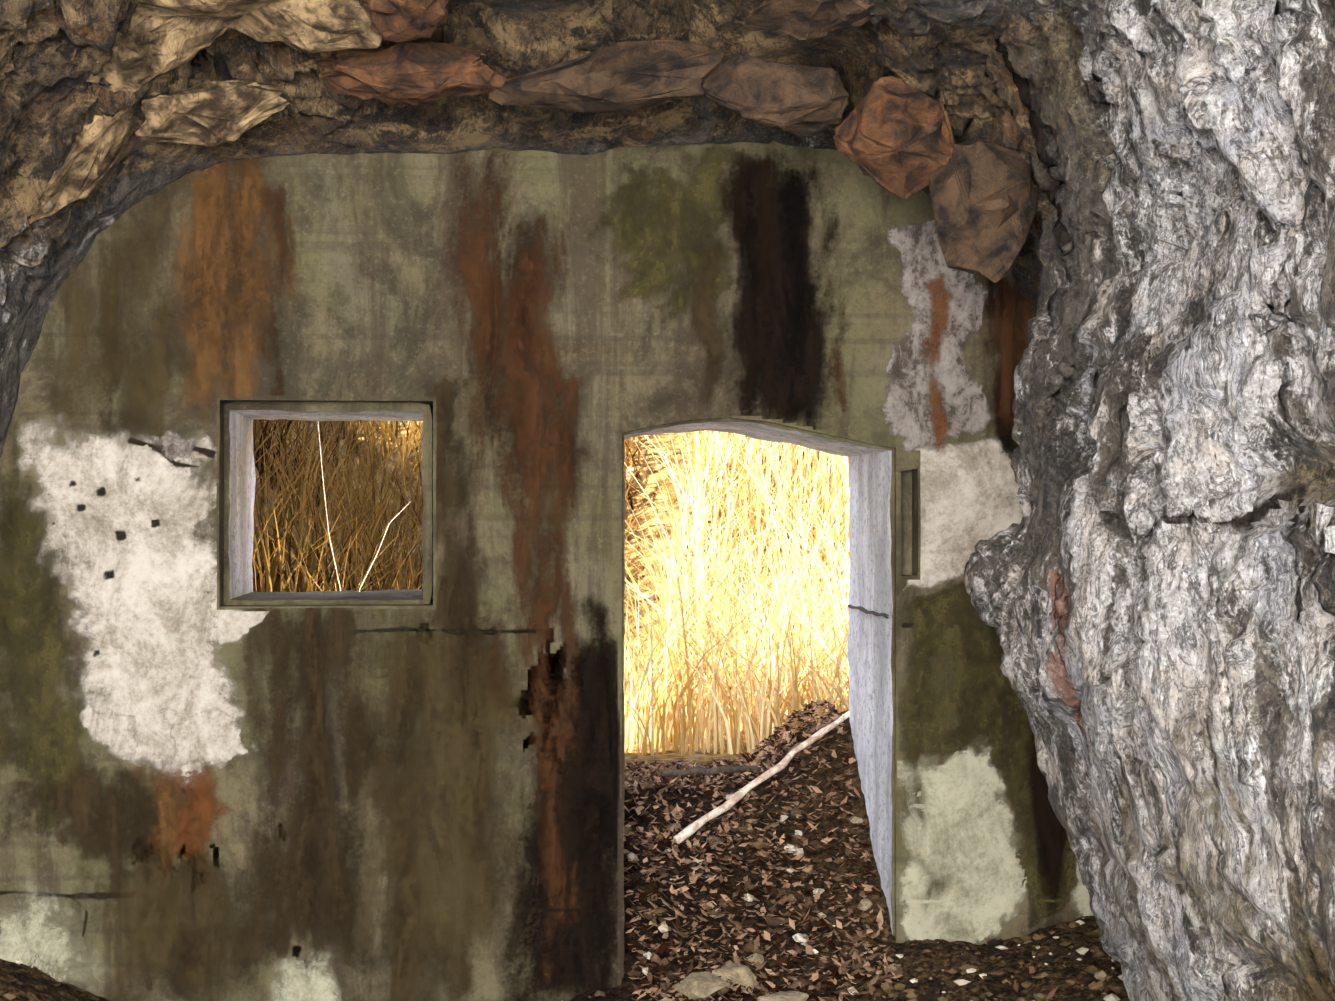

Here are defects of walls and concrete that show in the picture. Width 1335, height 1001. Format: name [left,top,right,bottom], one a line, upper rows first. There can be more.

flaking render [19,423,269,784]
rust [456,161,620,1001]
leakage [601,146,846,430]
flaking render [882,218,1023,587]
rust [155,766,224,875]
peeling [897,747,1027,944]